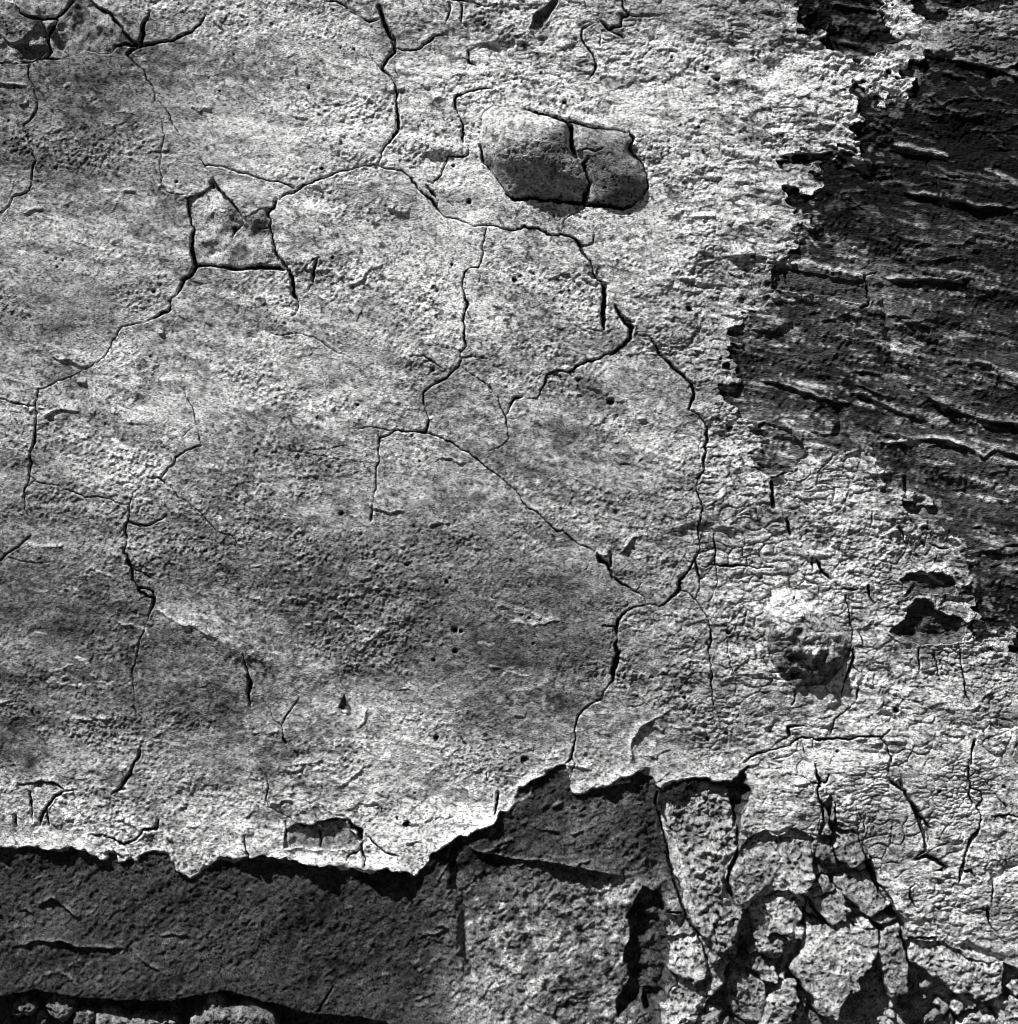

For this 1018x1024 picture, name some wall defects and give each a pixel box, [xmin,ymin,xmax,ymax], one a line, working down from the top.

flaking render [793,0,902,65]
flaking render [910,0,1015,23]
flaking render [718,49,1018,660]
crack [0,0,773,779]
crack [770,483,792,534]
crack [13,781,75,825]
crack [91,820,159,858]
crack [112,750,141,794]
crack [260,769,399,866]
crack [486,772,499,815]
crack [744,557,1018,944]
flaking render [0,765,1018,1024]